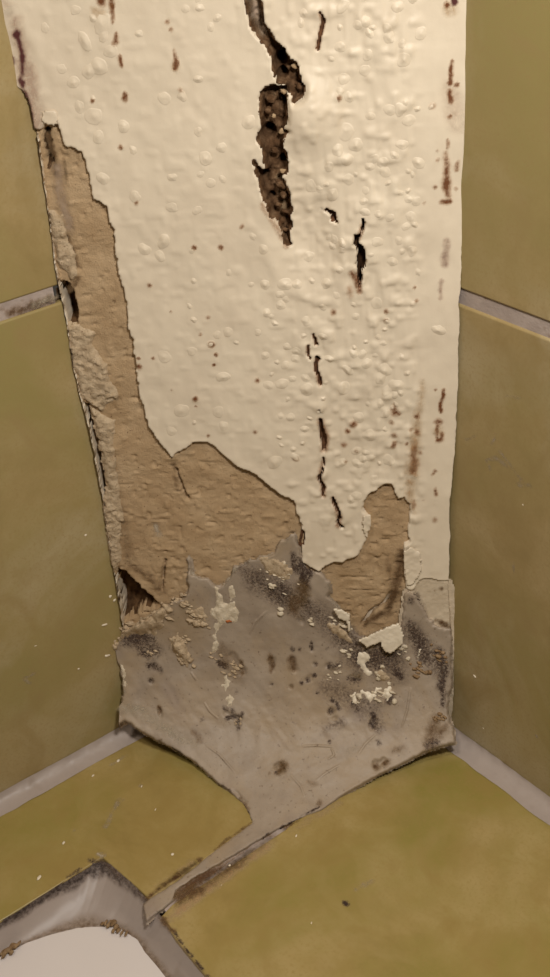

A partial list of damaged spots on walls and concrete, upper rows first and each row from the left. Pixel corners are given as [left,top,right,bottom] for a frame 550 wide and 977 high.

crack [244,0,326,246]
crack [325,208,366,293]
crack [307,333,322,385]
peeling [37,110,455,717]
rust [435,389,445,442]
crack [318,418,344,528]
damp [123,634,162,682]
damp [210,561,250,729]
damp [247,552,403,685]
damp [328,677,379,729]
damp [406,620,448,707]